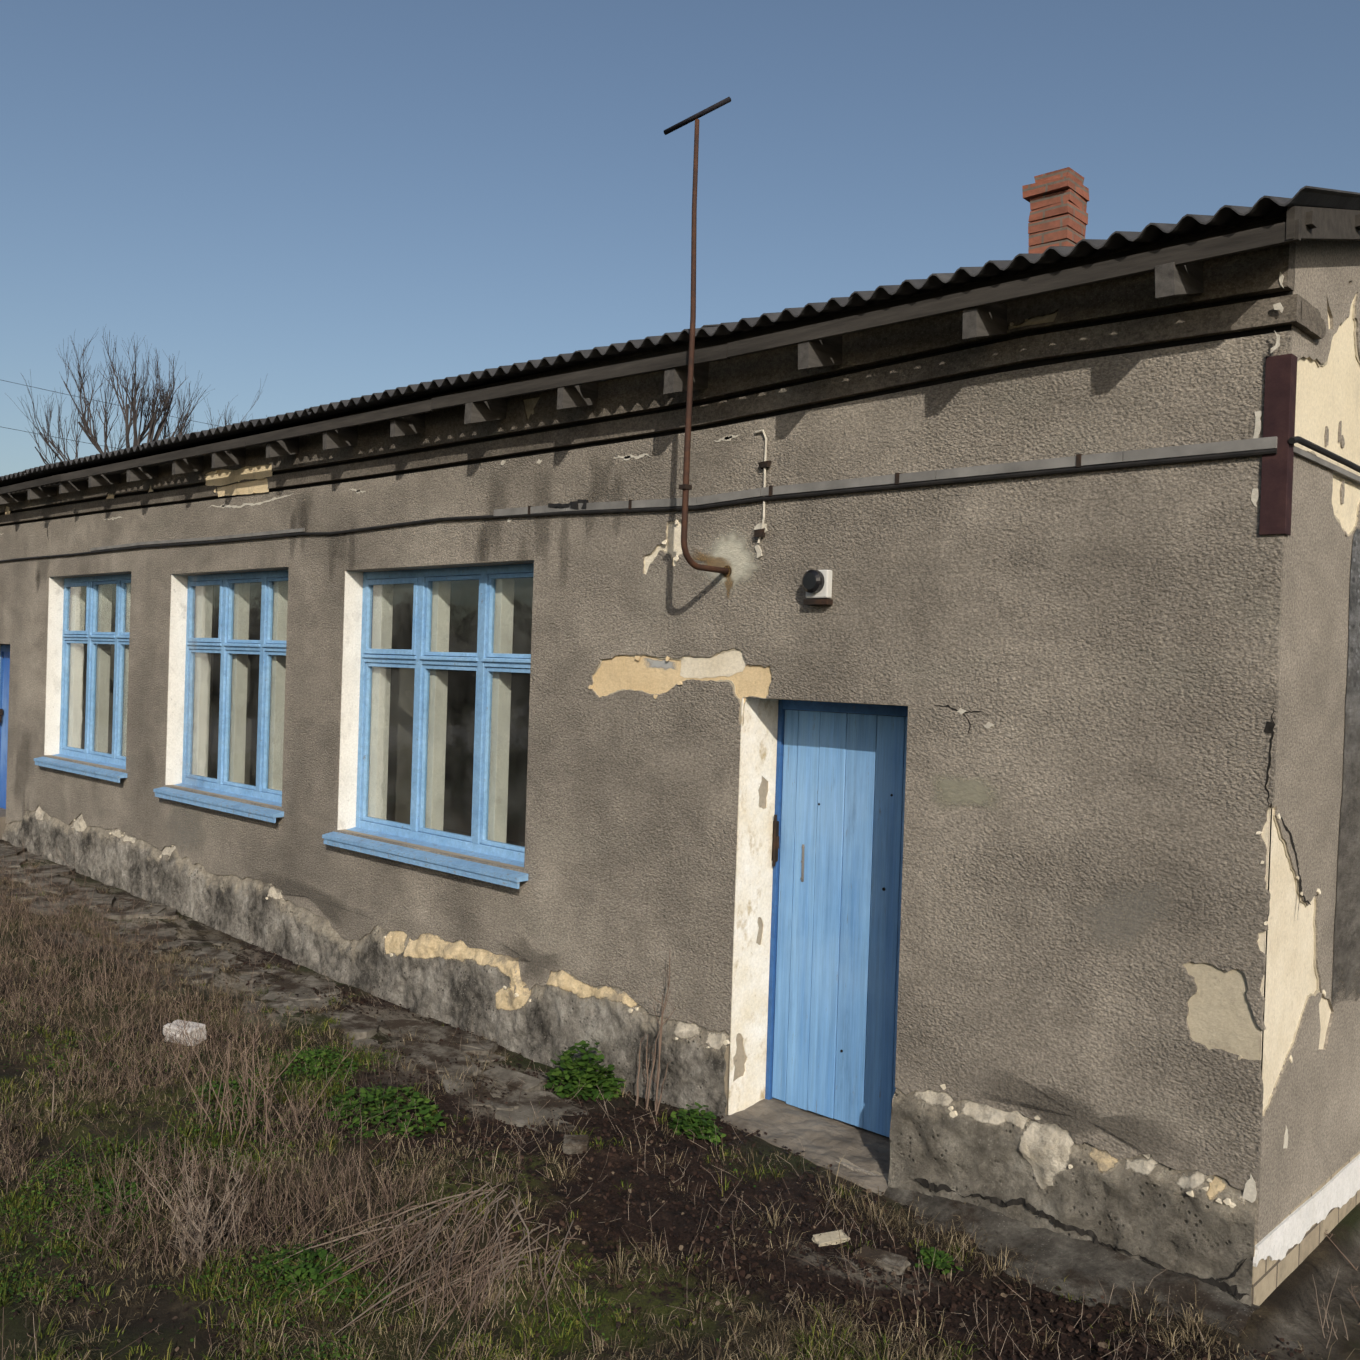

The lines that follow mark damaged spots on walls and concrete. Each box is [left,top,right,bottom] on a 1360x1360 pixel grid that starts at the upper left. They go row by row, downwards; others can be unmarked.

peeling [1294,293,1360,537]
peeling [205,464,294,508]
peeling [643,519,683,574]
peeling [588,648,772,726]
flaking render [71,814,87,832]
flaking render [109,829,136,843]
crack [1264,708,1311,920]
flaking render [265,883,283,900]
flaking render [1183,805,1331,1117]
flaking render [914,1084,1074,1190]
flaking render [1090,1147,1158,1175]
flaking render [1177,1171,1257,1208]